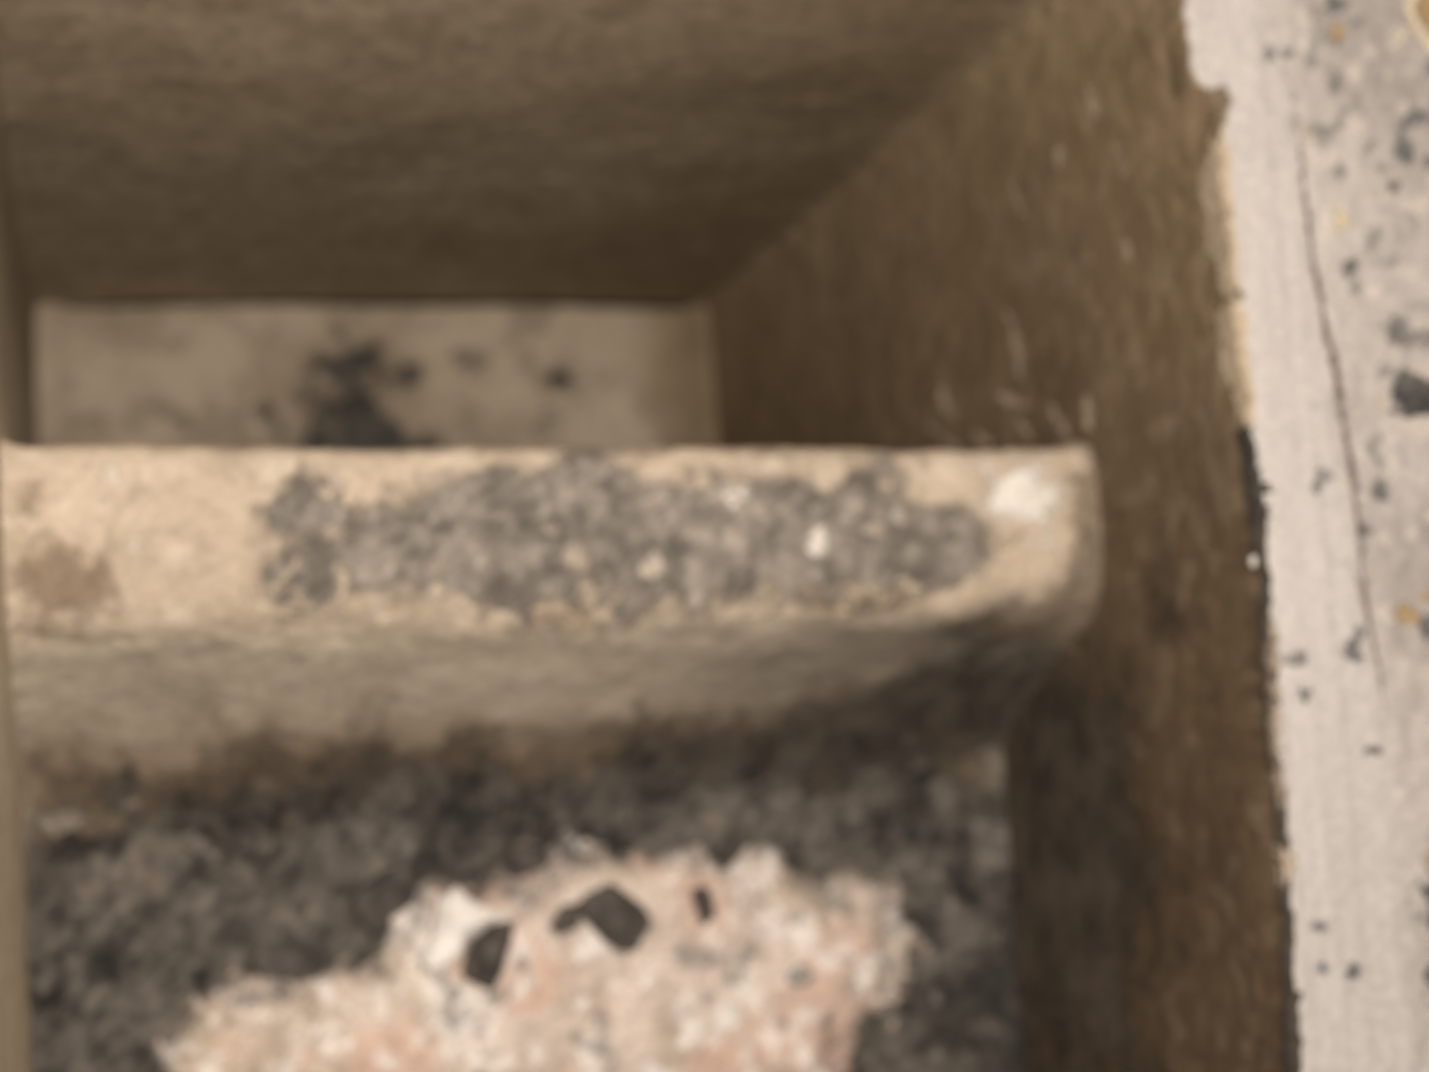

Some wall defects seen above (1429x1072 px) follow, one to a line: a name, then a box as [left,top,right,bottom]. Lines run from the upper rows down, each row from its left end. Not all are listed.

spalling [254,448,992,632]